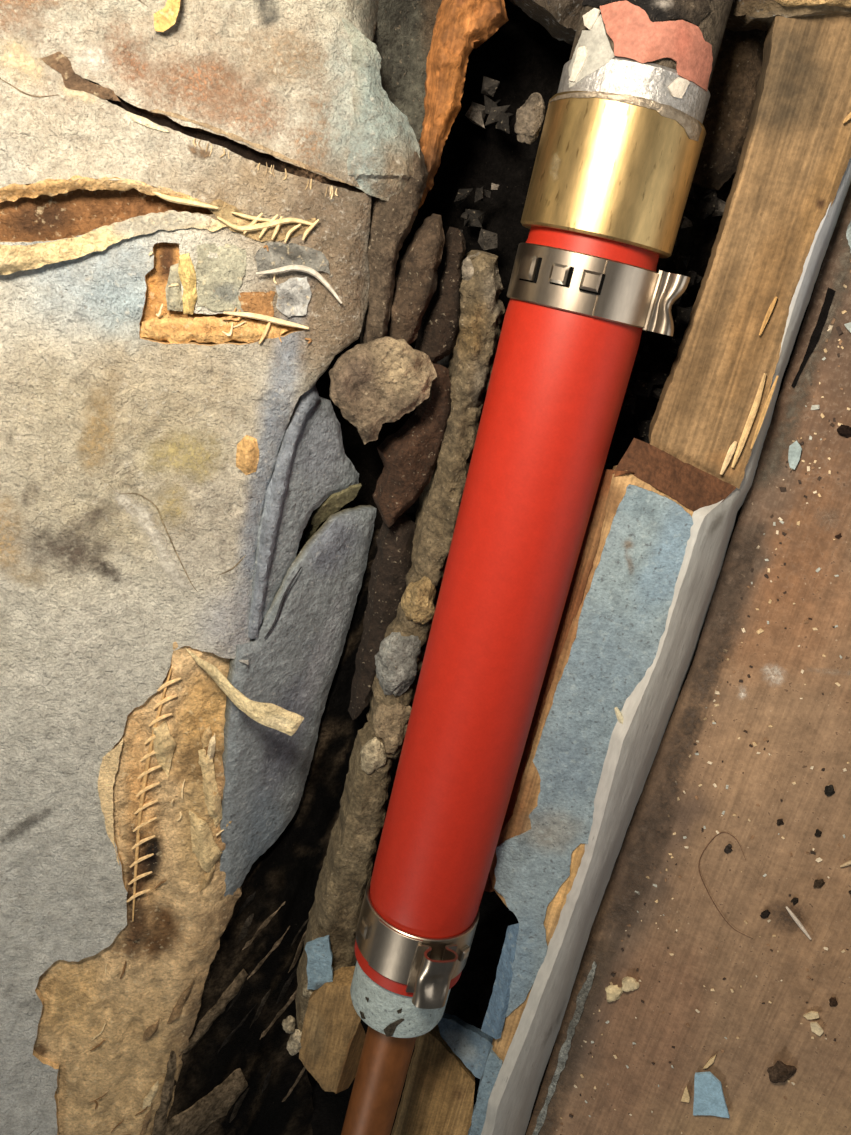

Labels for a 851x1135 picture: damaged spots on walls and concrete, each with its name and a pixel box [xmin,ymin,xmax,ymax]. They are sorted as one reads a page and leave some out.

crack [0,52,364,199]
peeling [34,641,304,1135]